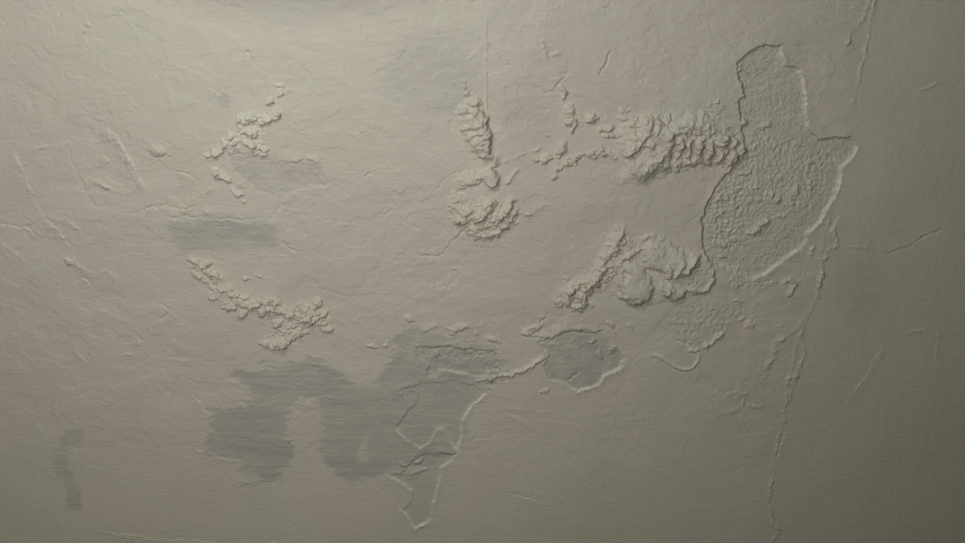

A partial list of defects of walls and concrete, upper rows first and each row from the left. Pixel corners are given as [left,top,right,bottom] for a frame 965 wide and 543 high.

damp [202,317,452,492]
peeling [402,311,635,395]